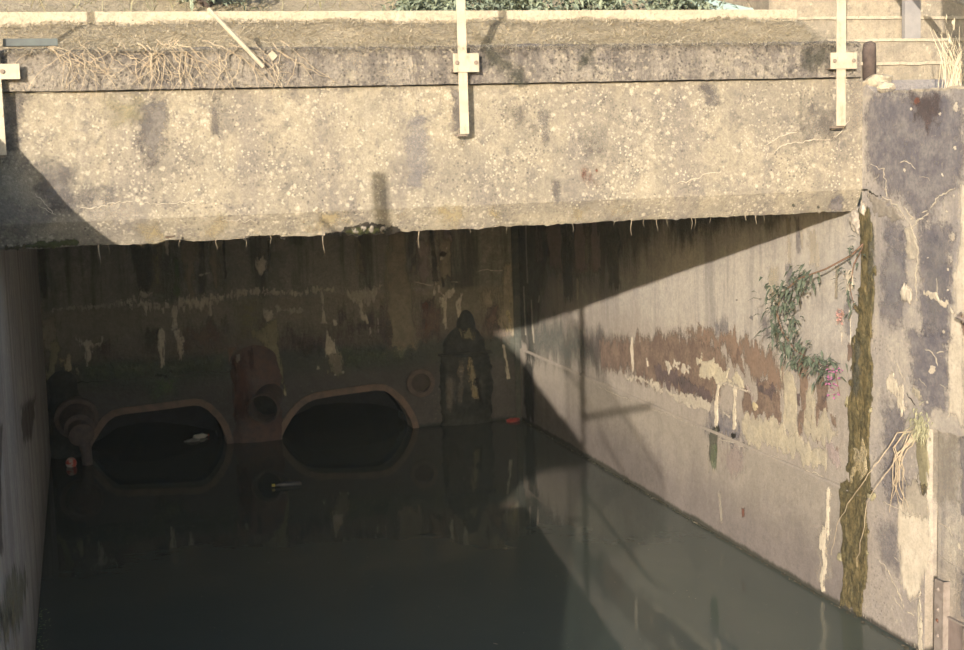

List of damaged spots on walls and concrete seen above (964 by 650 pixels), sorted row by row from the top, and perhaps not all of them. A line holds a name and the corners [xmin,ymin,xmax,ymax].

leakage [42,217,264,381]
leakage [251,206,476,396]
leakage [478,212,621,422]
leakage [677,217,723,241]
leakage [739,214,819,285]
leakage [840,269,861,397]
crack [871,161,955,227]
peeling [599,322,838,473]
leakage [819,486,832,592]